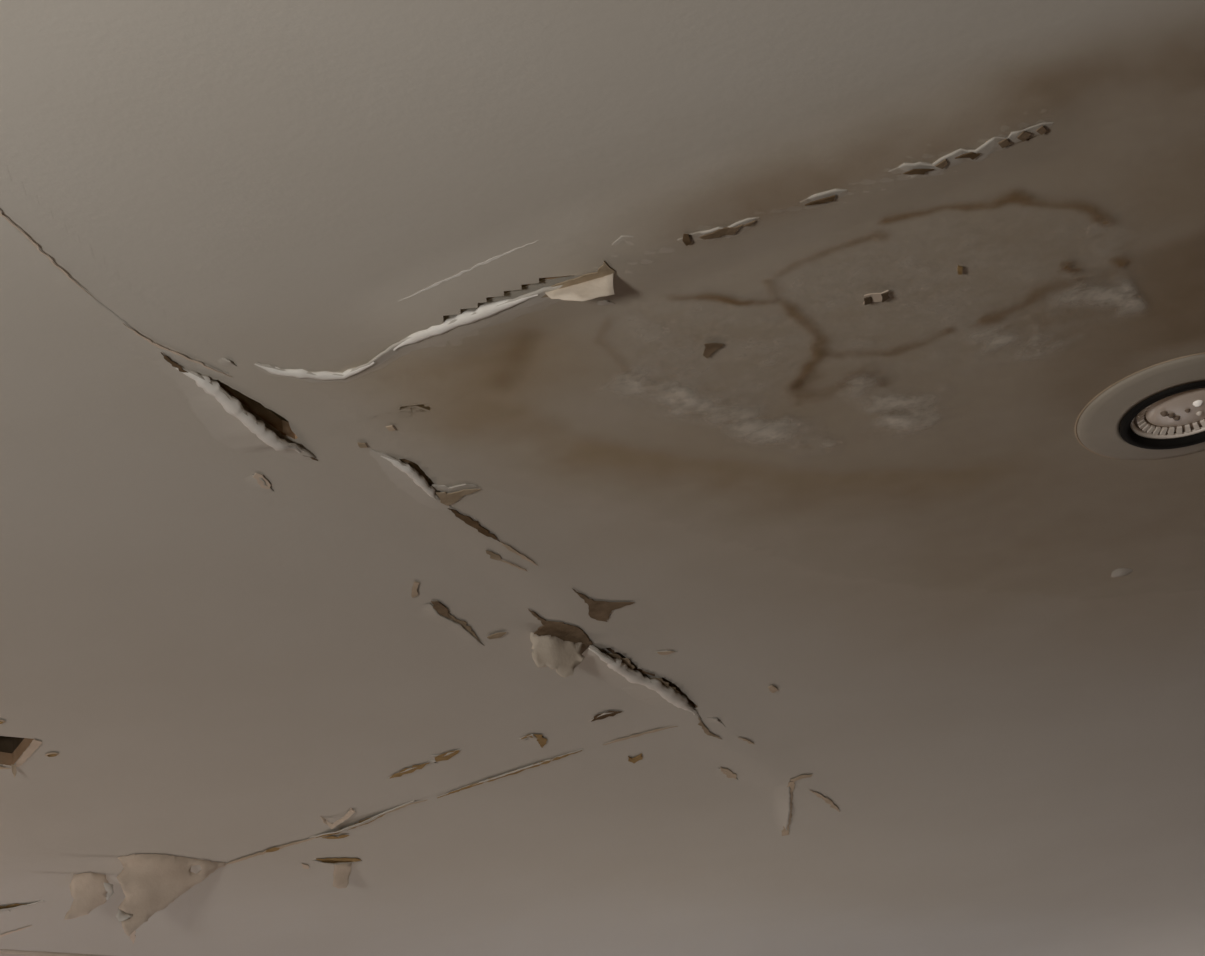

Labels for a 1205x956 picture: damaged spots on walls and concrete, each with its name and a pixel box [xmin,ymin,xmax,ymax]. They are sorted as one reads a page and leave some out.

crack [0,211,635,462]
crack [357,425,538,572]
peeling [528,609,592,678]
peeling [572,588,634,622]
crack [226,645,754,865]
peeling [116,854,226,944]
peeling [302,858,362,889]